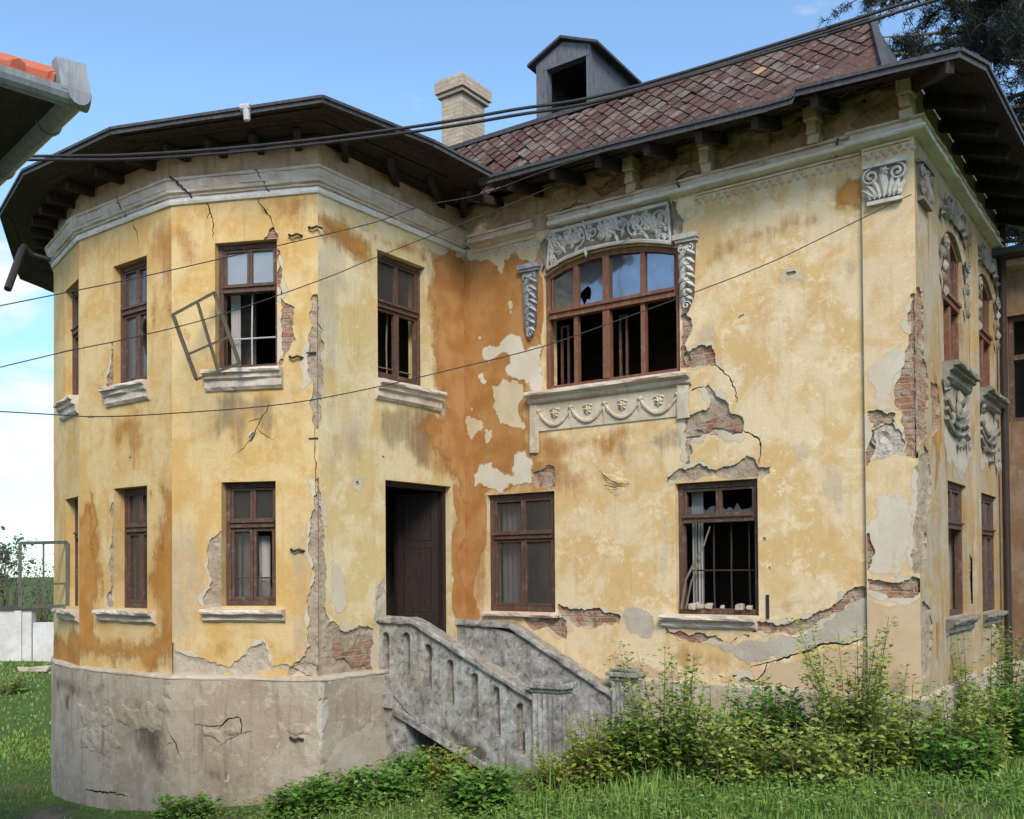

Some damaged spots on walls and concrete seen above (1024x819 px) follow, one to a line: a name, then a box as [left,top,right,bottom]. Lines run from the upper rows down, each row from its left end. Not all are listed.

crack [169,176,214,240]
crack [254,168,274,227]
flaking render [953,232,980,285]
spalling [261,206,325,429]
peeling [465,334,543,450]
crack [234,401,271,455]
peeling [474,450,557,493]
flaking render [666,287,1001,685]
spalling [173,474,386,756]
spalling [525,604,624,639]
crack [195,716,252,746]